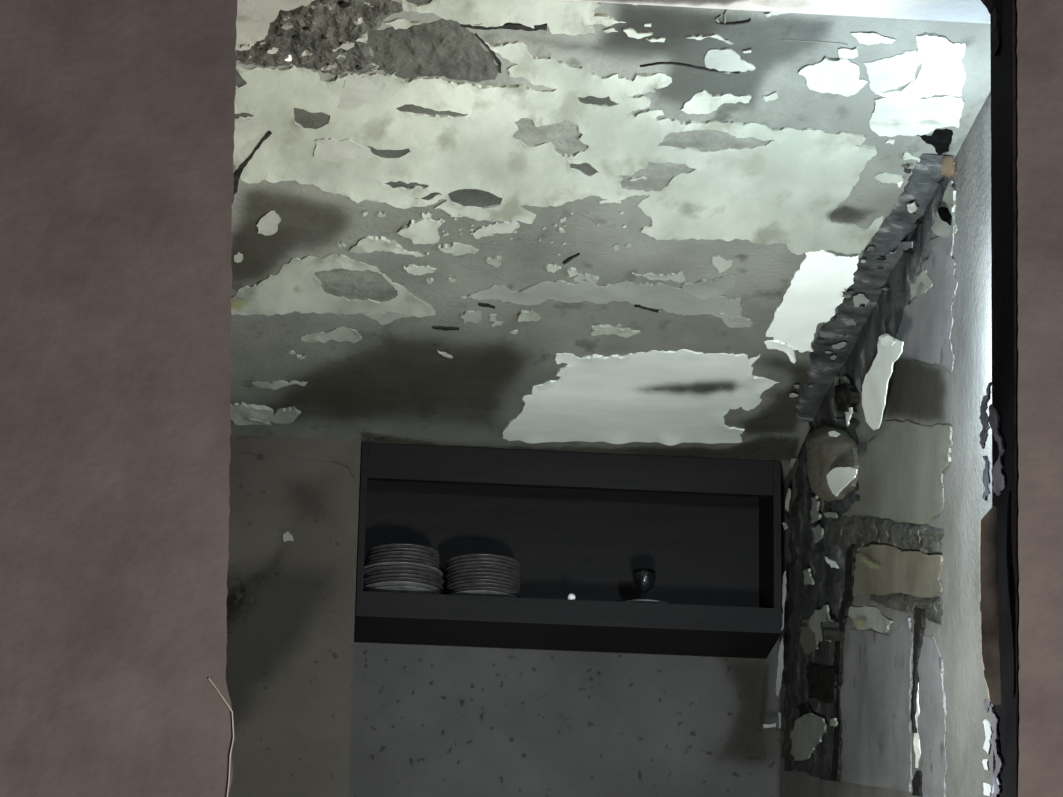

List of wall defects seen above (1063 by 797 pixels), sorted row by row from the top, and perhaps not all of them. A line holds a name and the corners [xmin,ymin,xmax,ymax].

flaking render [981,0,1001,56]
crack [232,131,272,204]
peeling [230,0,966,797]
damp [654,384,734,394]
peeling [979,382,1006,501]
damp [226,574,318,715]
peeling [982,698,1003,797]